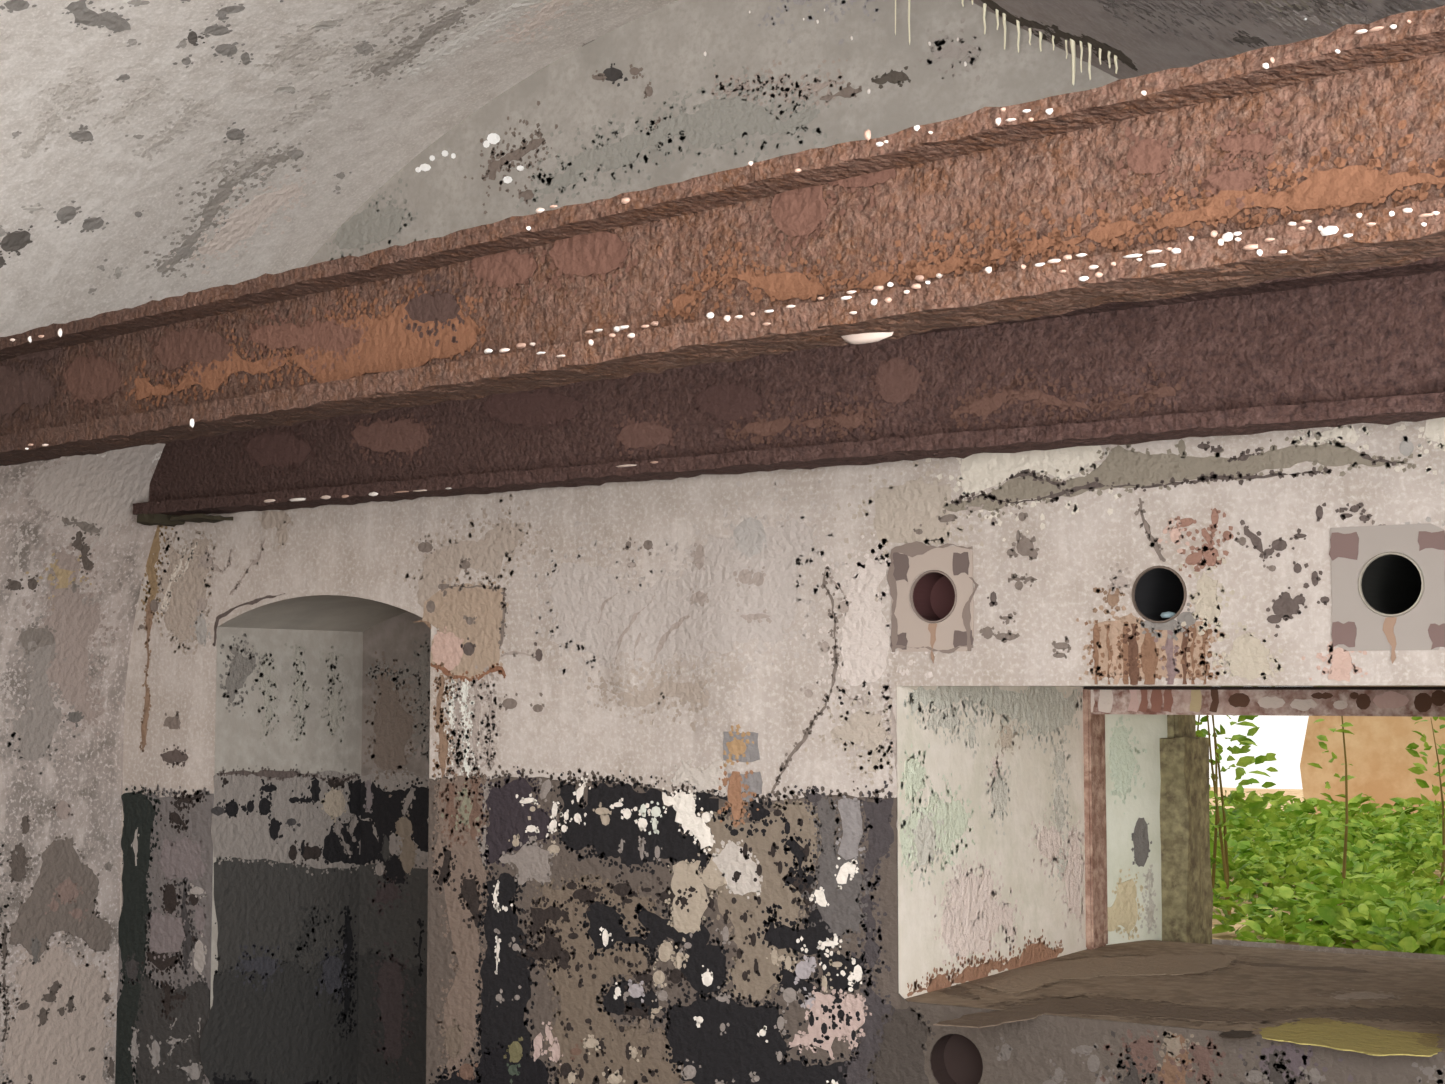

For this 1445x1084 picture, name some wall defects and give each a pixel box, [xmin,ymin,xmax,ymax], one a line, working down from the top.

damp [62,0,150,47]
damp [0,201,109,268]
rust [653,108,1445,320]
rust [124,231,638,410]
damp [484,342,566,358]
crack [764,566,869,802]
spalling [938,434,1416,591]
rust [1157,516,1229,578]
rust [1076,563,1445,713]
spalling [1209,508,1330,637]
spalling [499,759,763,1084]
spalling [757,934,872,1062]